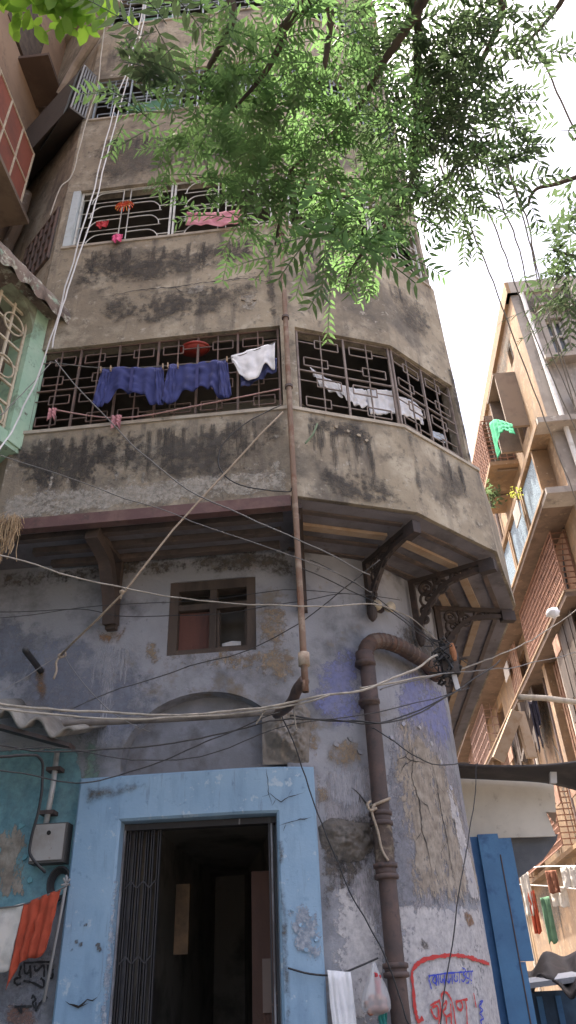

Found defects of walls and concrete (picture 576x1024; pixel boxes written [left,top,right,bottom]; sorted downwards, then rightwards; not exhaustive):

damp [77,239,276,322]
damp [4,421,286,518]
damp [309,418,399,502]
crack [262,771,310,831]
crack [398,725,467,892]
peeling [0,823,33,897]